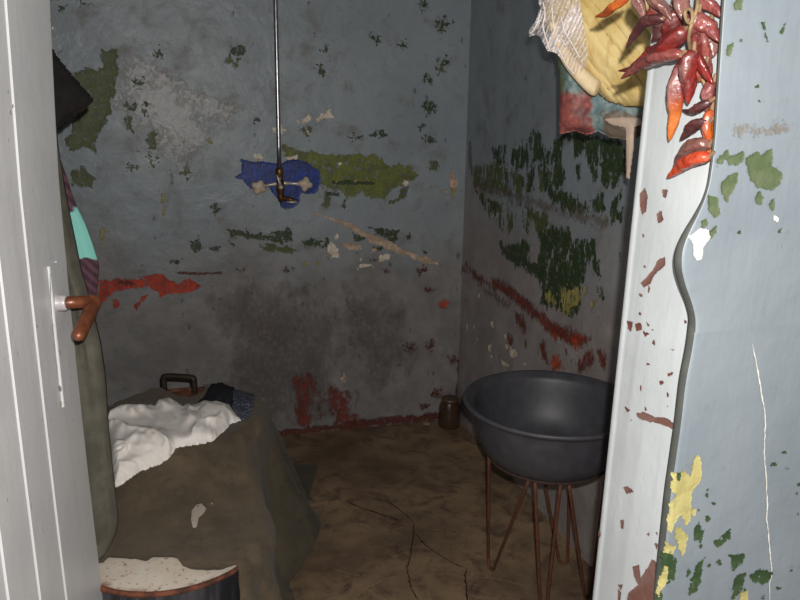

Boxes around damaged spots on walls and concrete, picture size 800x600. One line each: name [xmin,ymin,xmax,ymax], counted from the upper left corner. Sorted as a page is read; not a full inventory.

peeling [71,165,96,189]
peeling [64,47,119,152]
peeling [123,101,150,134]
peeling [126,131,159,172]
peeling [190,109,439,276]
peeling [418,95,437,143]
peeling [468,128,626,319]
peeling [689,148,783,260]
peeling [98,258,222,310]
crack [752,344,772,600]
crack [347,498,468,600]
peeling [655,455,781,600]